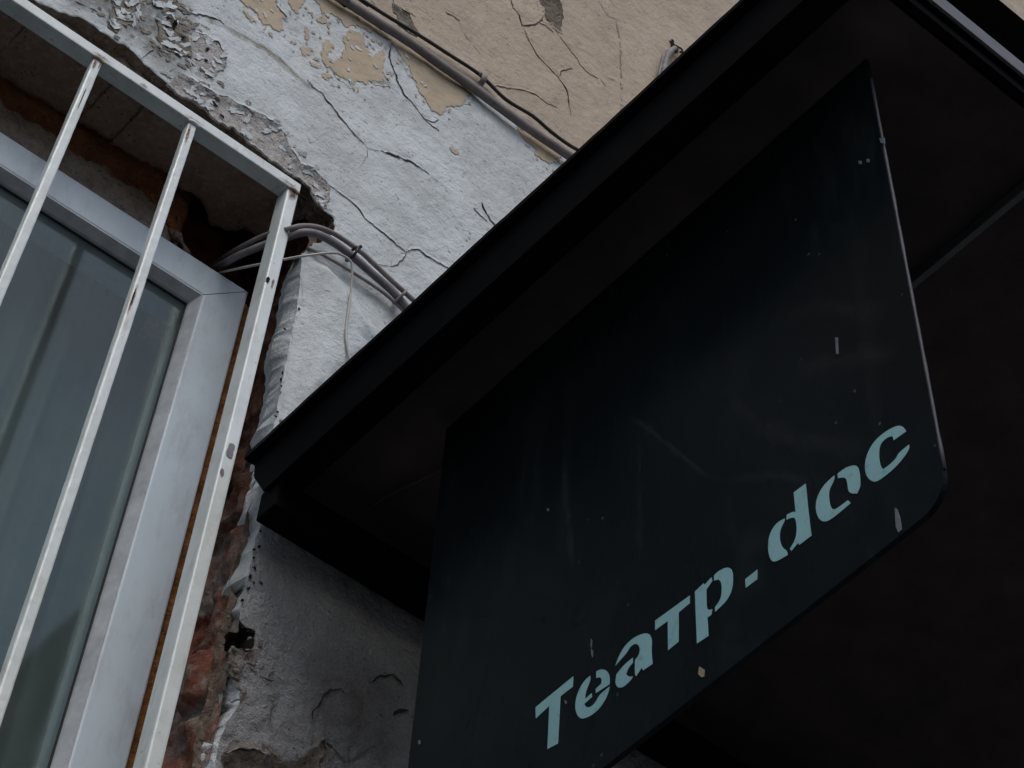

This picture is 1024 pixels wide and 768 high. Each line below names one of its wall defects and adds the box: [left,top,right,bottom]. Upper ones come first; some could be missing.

flaking render [97,0,334,211]
peeling [241,0,479,119]
crack [494,0,615,112]
crack [178,60,453,268]
flaking render [224,628,265,697]
flaking render [221,732,335,768]
crack [311,688,347,719]
crack [371,674,409,716]